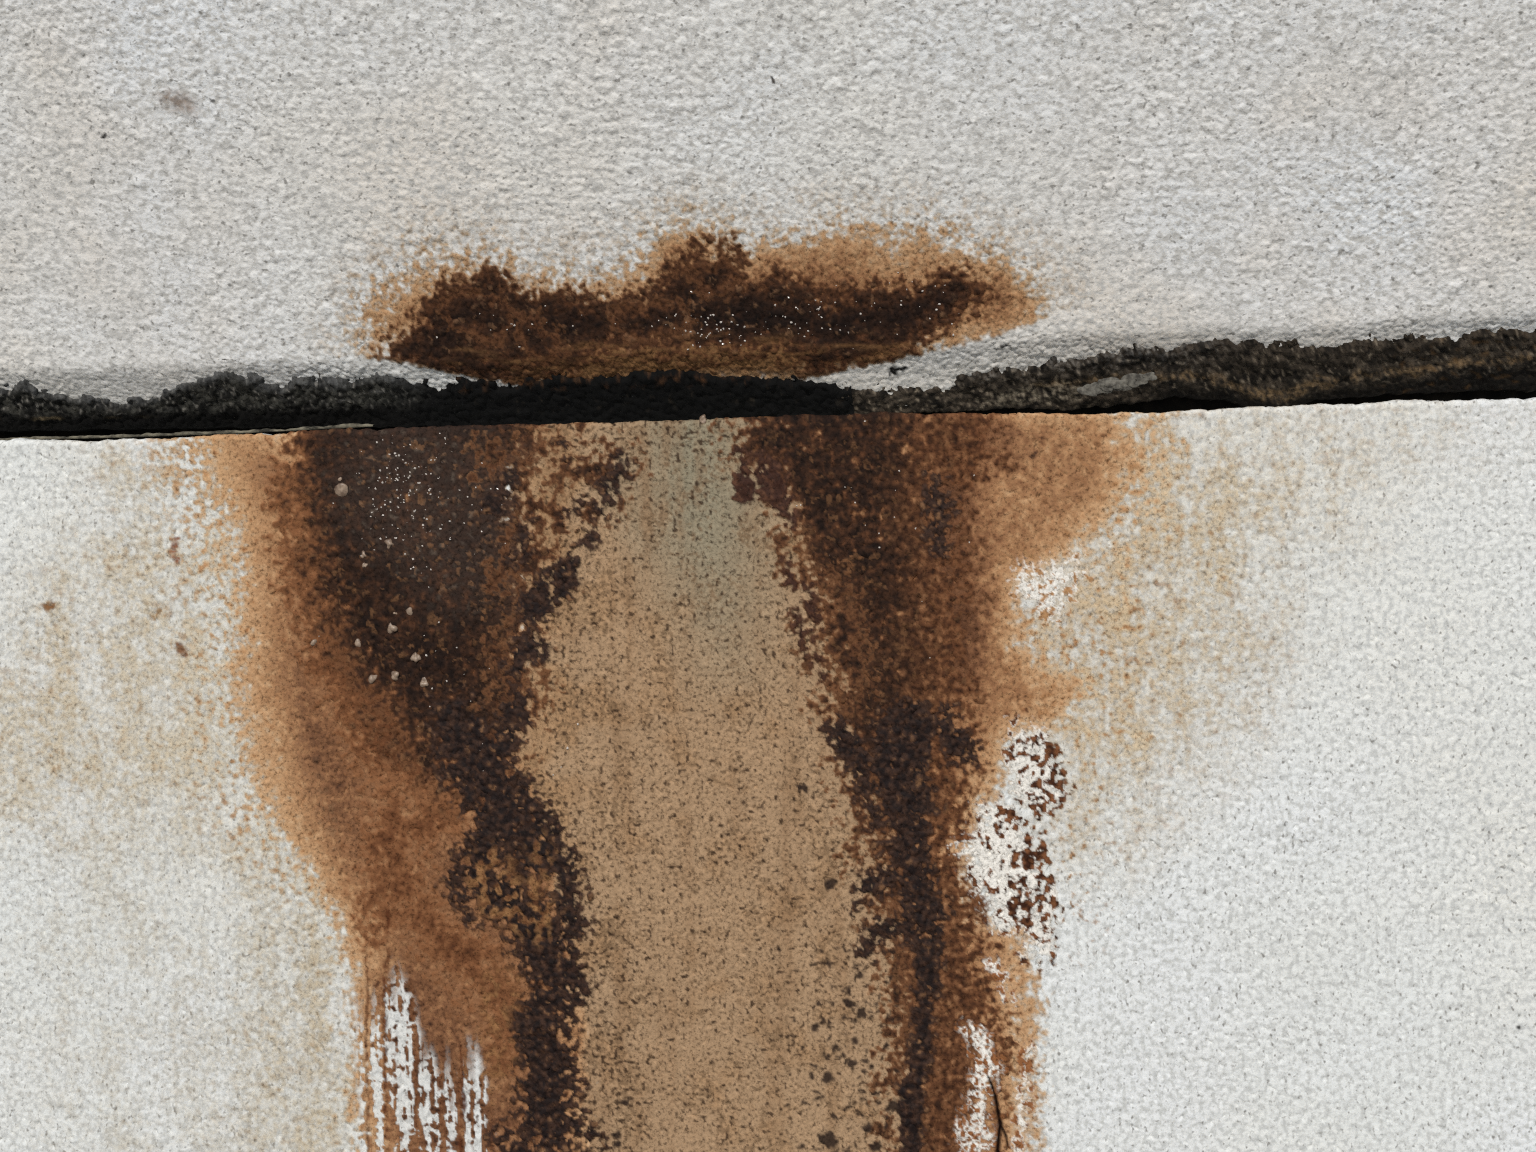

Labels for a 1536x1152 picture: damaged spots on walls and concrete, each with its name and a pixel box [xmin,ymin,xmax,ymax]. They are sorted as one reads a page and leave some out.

corrosion [344,203,1053,386]
corrosion [157,411,1189,1152]
peeling [960,723,1065,970]